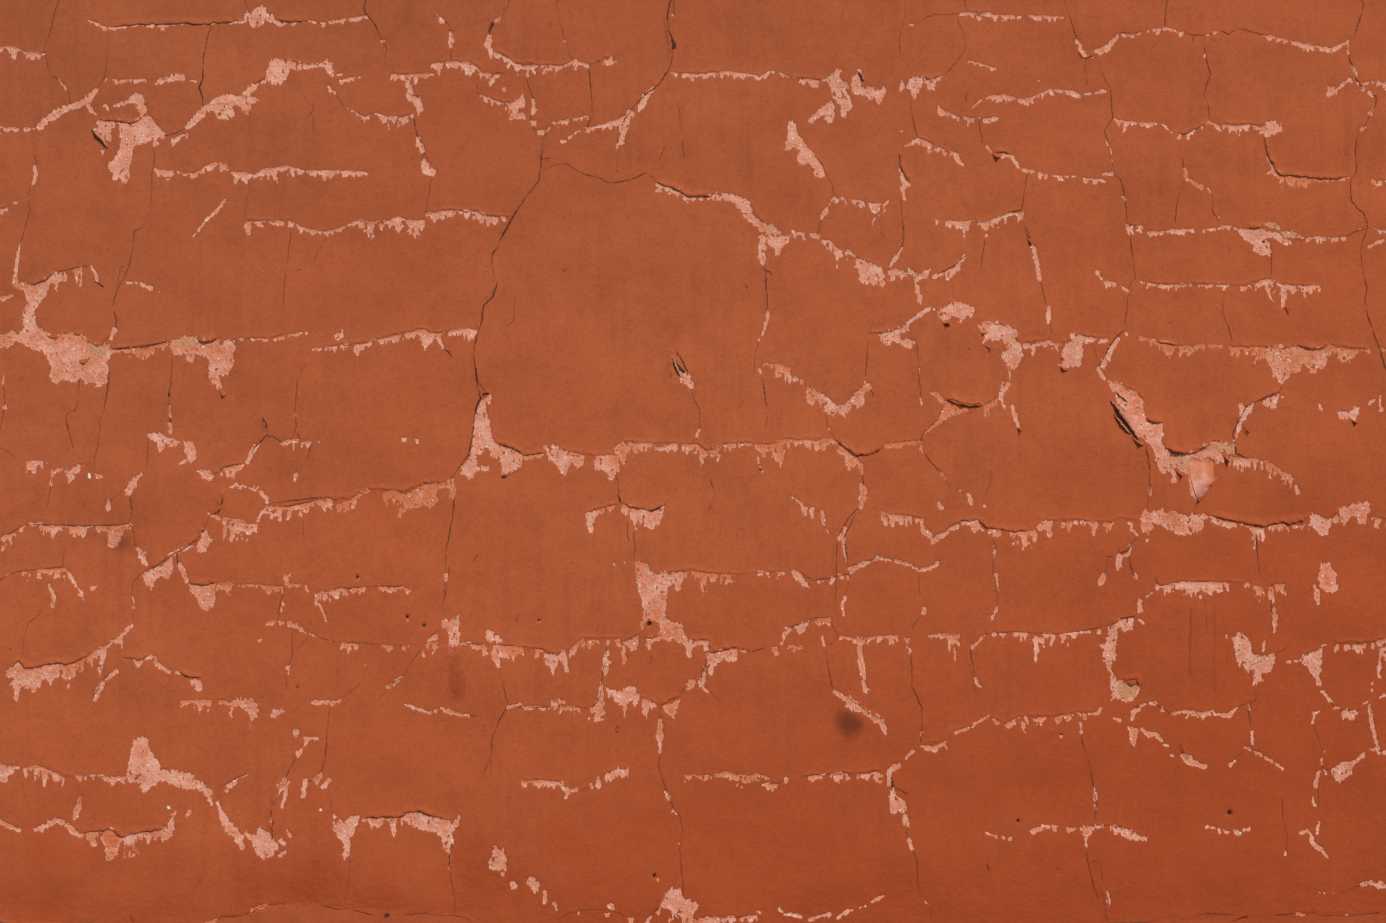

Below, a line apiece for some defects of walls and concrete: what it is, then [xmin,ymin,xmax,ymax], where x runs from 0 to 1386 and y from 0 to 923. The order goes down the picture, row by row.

peeling [0,156,477,396]
peeling [281,379,320,482]
peeling [0,3,617,243]
crack [442,0,684,610]
peeling [383,0,1350,518]
crack [1096,64,1136,380]
peeling [881,159,1386,569]
peeling [0,432,1386,923]
crack [835,497,861,616]
crack [1098,538,1138,586]
crack [1229,746,1288,856]
crack [1189,880,1386,921]